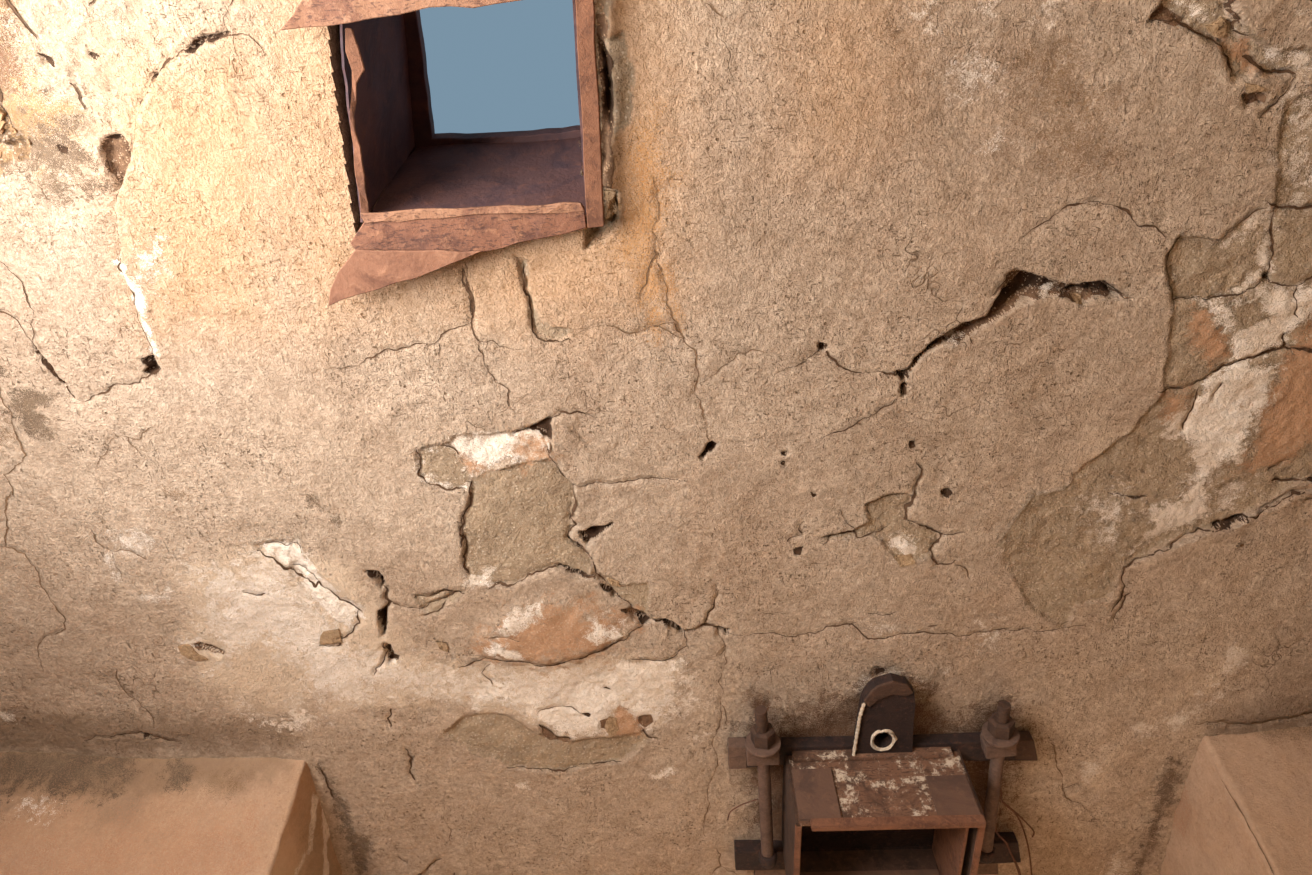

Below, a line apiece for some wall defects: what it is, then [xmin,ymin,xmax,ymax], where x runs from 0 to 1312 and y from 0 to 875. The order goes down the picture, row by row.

crack [0,0,265,401]
crack [332,264,524,406]
spalling [902,270,1133,395]
peeling [996,0,1312,631]
crack [1159,201,1312,430]
spalling [257,536,374,647]
peeling [408,417,650,624]
crack [365,178,1083,874]
peeling [821,440,969,578]
crack [1107,459,1312,624]
peeling [443,631,691,772]
rust [723,656,1063,850]